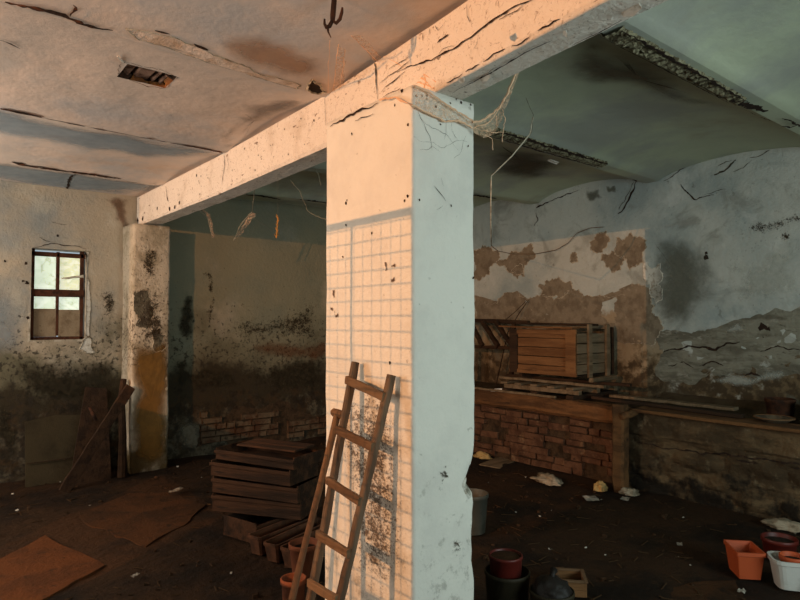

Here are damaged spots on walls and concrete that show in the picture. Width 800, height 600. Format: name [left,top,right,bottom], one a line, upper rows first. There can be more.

crack [5,1,113,31]
flaking render [117,28,327,95]
crack [325,63,378,127]
crack [398,0,531,72]
spalling [600,4,770,121]
crack [0,108,228,180]
spalling [488,128,608,168]
damp [180,297,193,336]
flaking render [472,230,800,385]
damp [658,247,701,315]
damp [24,363,110,397]
damp [348,394,400,587]